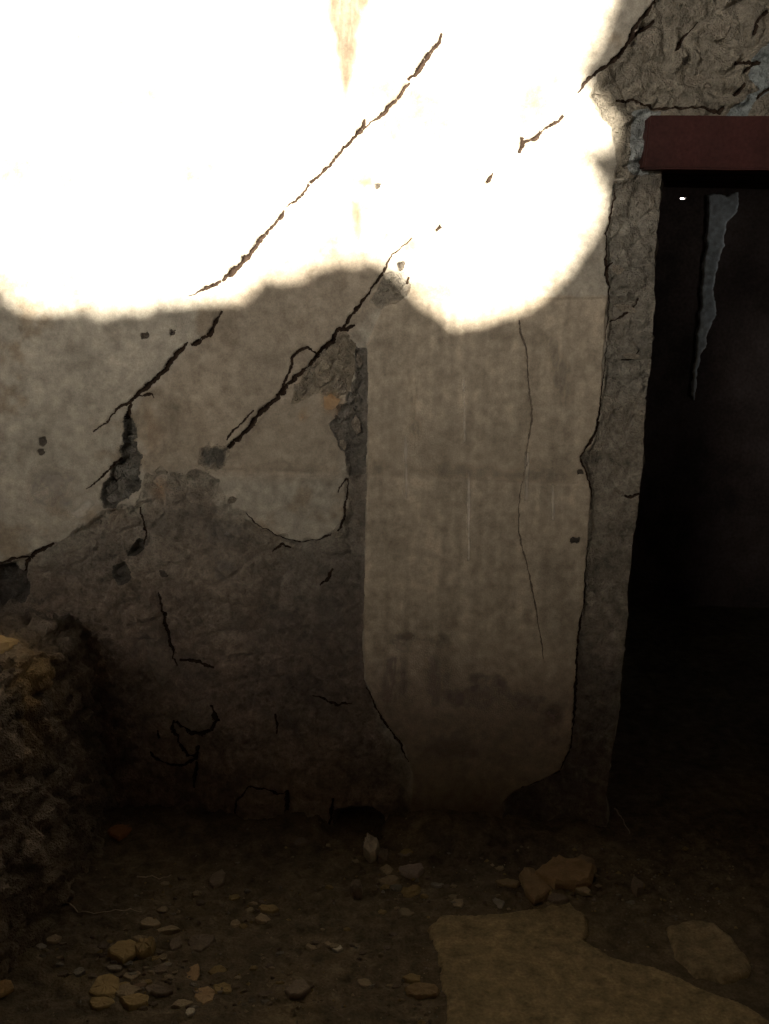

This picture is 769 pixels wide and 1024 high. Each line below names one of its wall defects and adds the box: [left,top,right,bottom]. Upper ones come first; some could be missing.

crack [577,0,656,93]
crack [189,33,443,296]
crack [518,115,564,154]
crack [86,457,123,489]
crack [93,311,223,432]
crack [226,225,442,449]
crack [518,320,544,659]
flaking render [547,0,769,827]
crack [158,592,214,668]
flaking render [0,331,411,826]
crack [150,705,220,788]